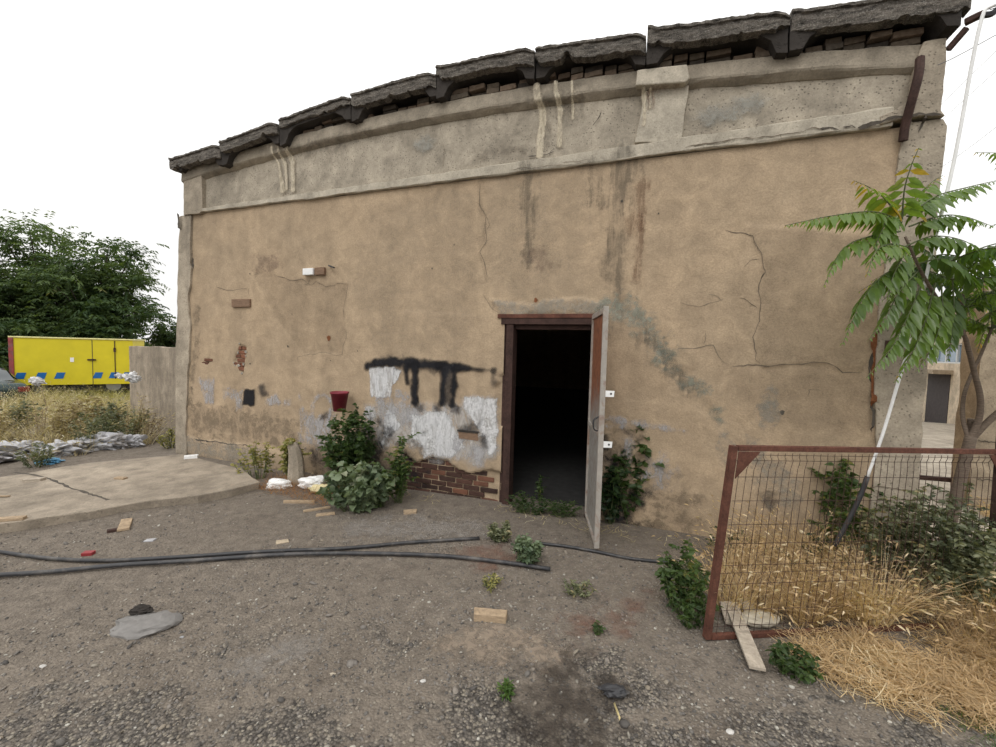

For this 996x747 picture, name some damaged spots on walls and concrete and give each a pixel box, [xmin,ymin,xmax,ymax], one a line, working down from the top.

crack [679,228,875,432]
peeling [381,410,400,445]
flaking render [404,454,498,501]